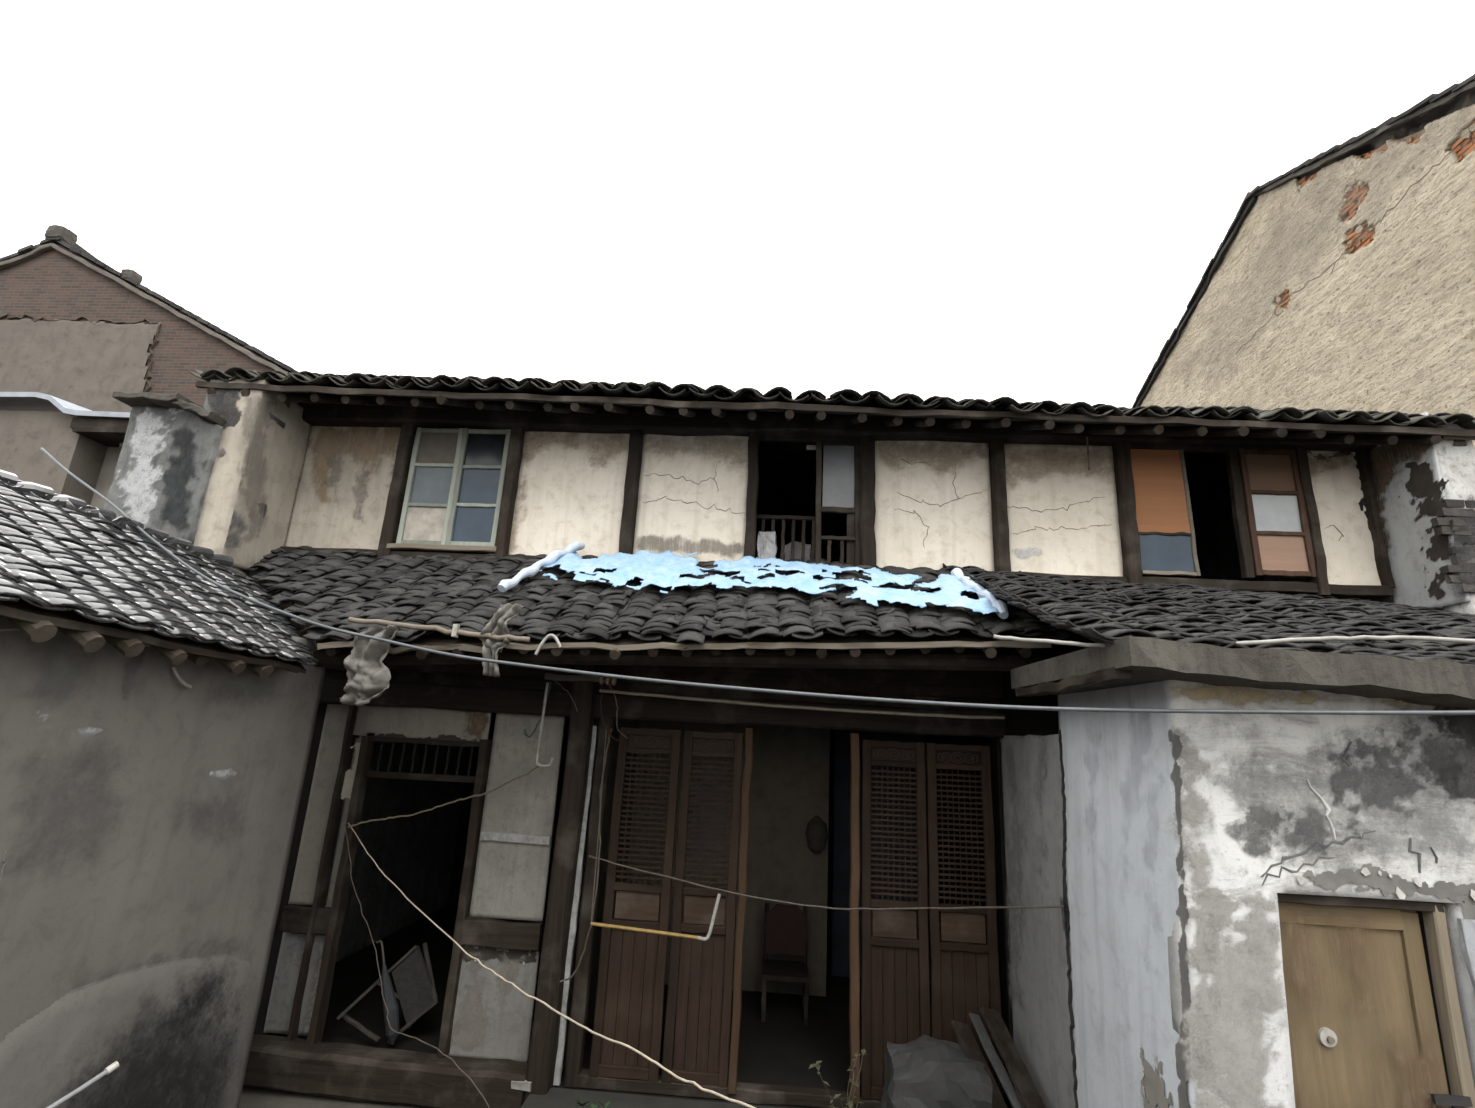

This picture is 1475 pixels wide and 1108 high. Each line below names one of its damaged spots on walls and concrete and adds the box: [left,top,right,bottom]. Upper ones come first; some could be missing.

spalling [1335,129,1425,254]
spalling [1448,121,1475,162]
spalling [1274,290,1291,316]
spalling [1398,460,1475,600]